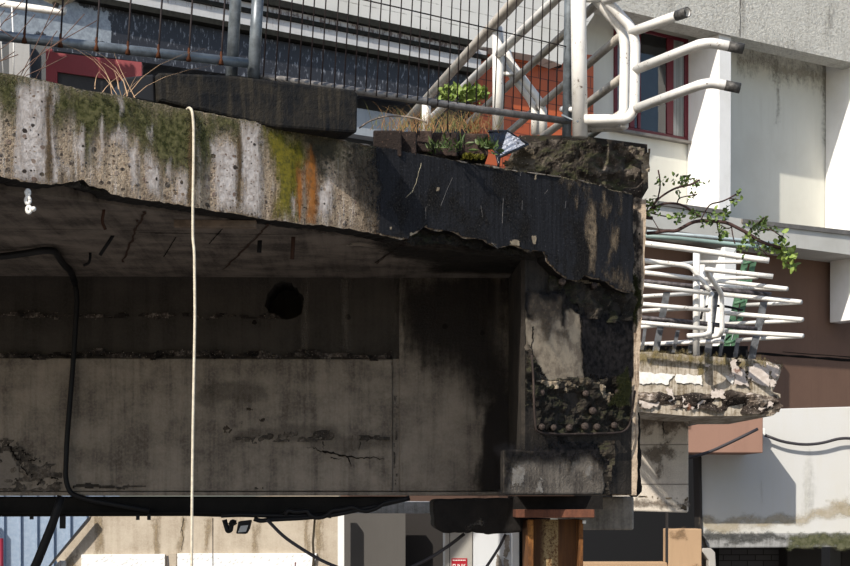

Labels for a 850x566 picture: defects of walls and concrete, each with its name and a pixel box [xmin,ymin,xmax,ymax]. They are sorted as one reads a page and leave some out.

leakage [13,80,69,182]
leakage [75,131,85,164]
leakage [116,112,197,202]
leakage [211,122,337,219]
corrosion [296,147,319,224]
leakage [346,143,382,231]
spalling [404,229,537,254]
spalling [548,184,637,323]
spalling [525,352,783,435]
spalling [0,438,62,492]
crack [309,442,383,464]
leakage [702,502,850,545]